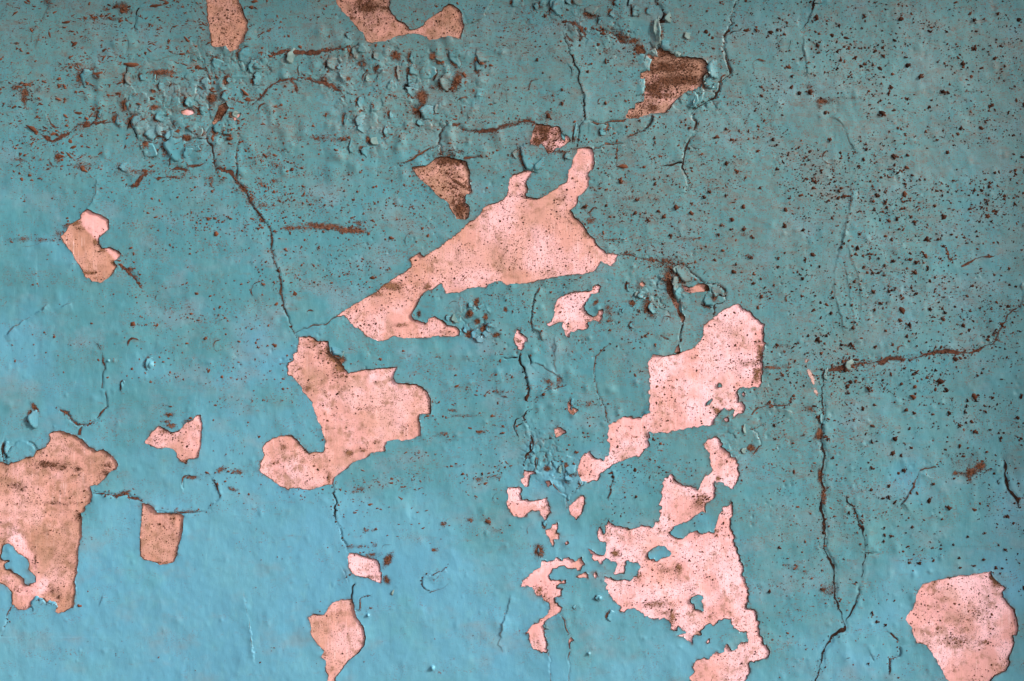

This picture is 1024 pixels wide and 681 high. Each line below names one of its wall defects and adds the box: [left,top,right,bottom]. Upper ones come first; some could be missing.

peeling [319,0,493,127]
crack [555,18,653,165]
peeling [61,209,121,283]
crack [38,66,339,338]
peeling [337,123,619,343]
peeling [0,410,118,613]
peeling [140,503,184,565]
peeling [259,336,431,490]
peeling [507,281,770,681]
crack [751,302,1021,681]
peeling [308,599,366,681]
peeling [906,571,1019,681]